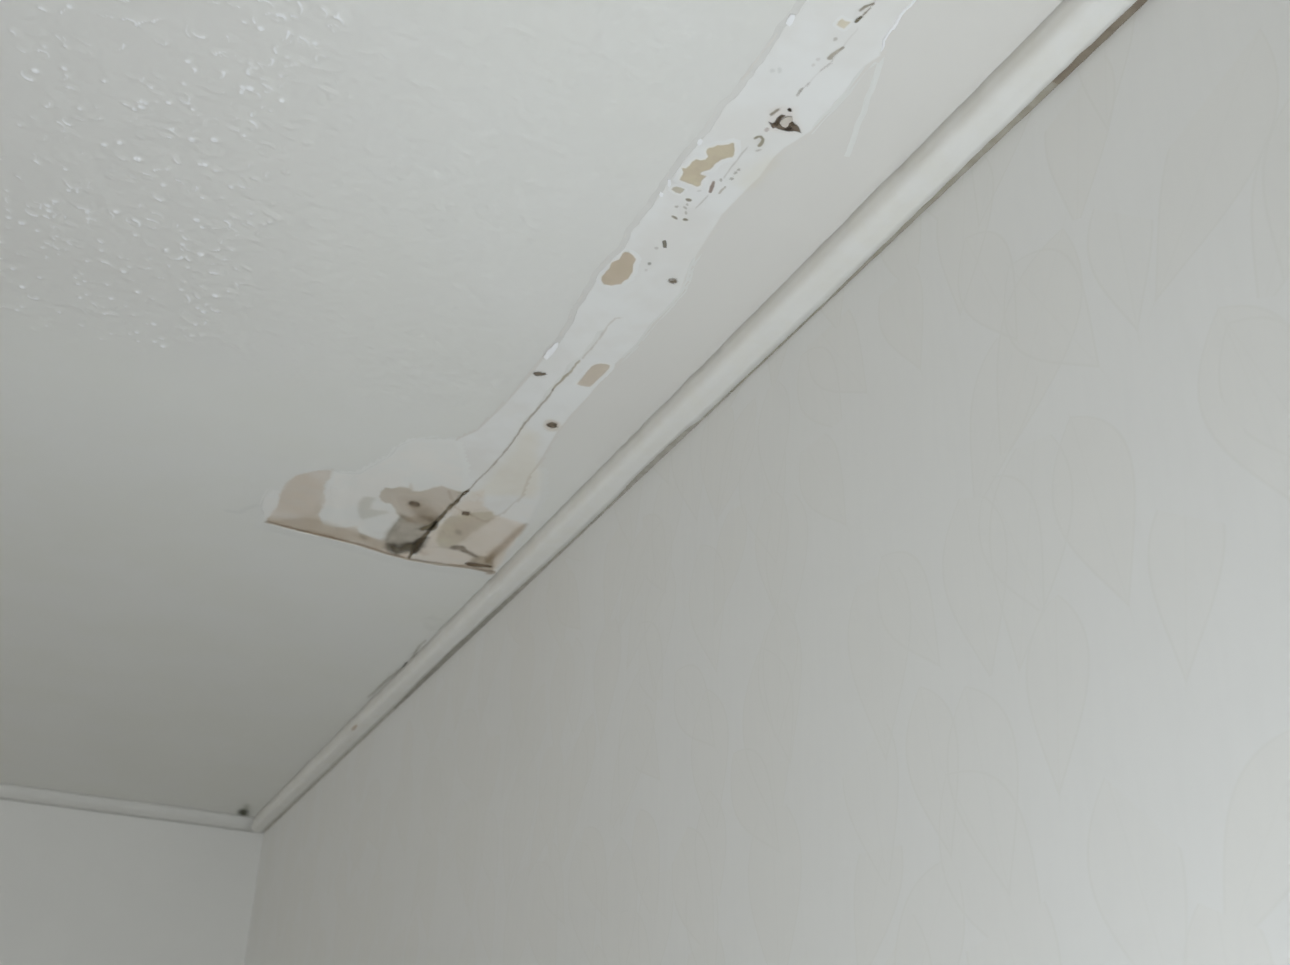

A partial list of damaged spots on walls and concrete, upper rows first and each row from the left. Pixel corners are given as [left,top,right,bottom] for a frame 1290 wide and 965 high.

water stain [253,445,550,574]
peeling [308,0,918,539]
crack [263,0,1148,832]